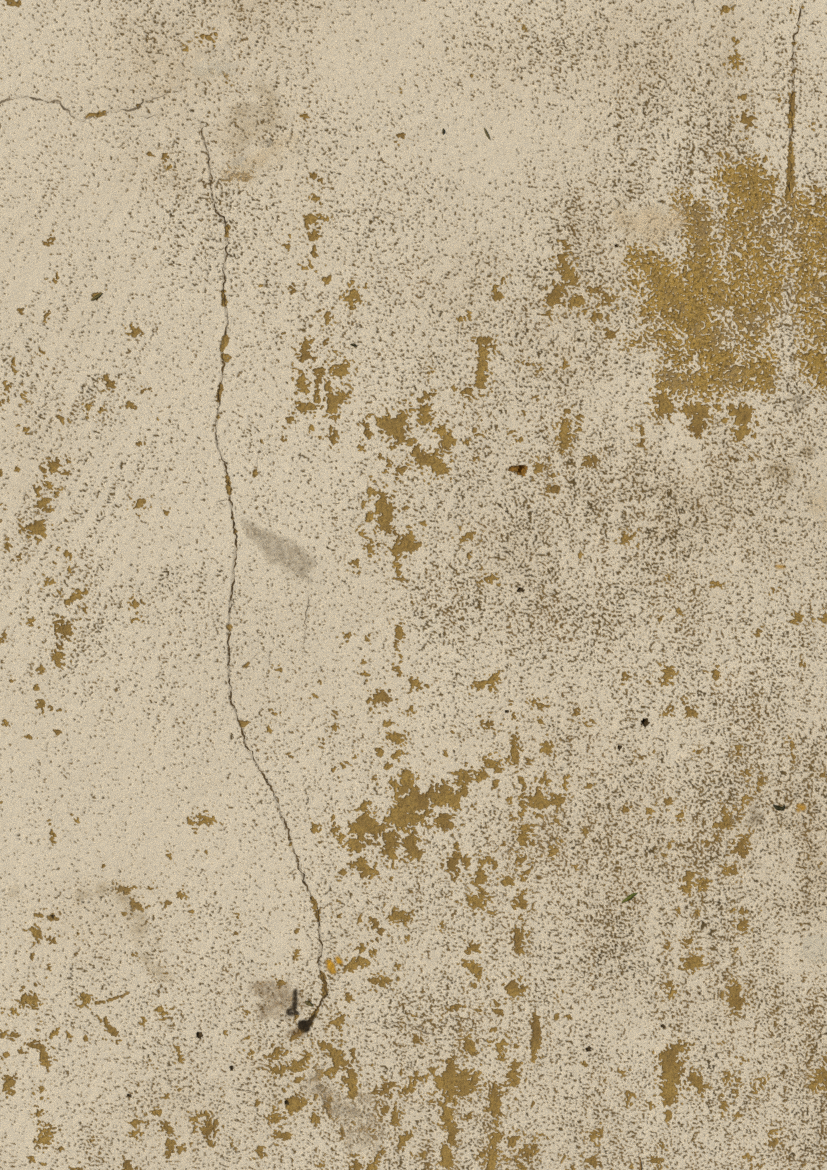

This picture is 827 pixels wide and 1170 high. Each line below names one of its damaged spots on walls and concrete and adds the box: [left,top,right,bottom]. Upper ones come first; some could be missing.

peeling [277,170,369,451]
peeling [4,454,71,563]
peeling [20,547,88,717]
crack [201,128,329,1037]
peeling [530,404,605,505]
peeling [618,662,699,724]
peeling [0,907,88,1169]
peeling [126,1086,240,1163]
peeling [238,618,613,1170]
peeling [599,1037,770,1170]
peeling [662,931,712,1002]
peeling [675,739,767,917]